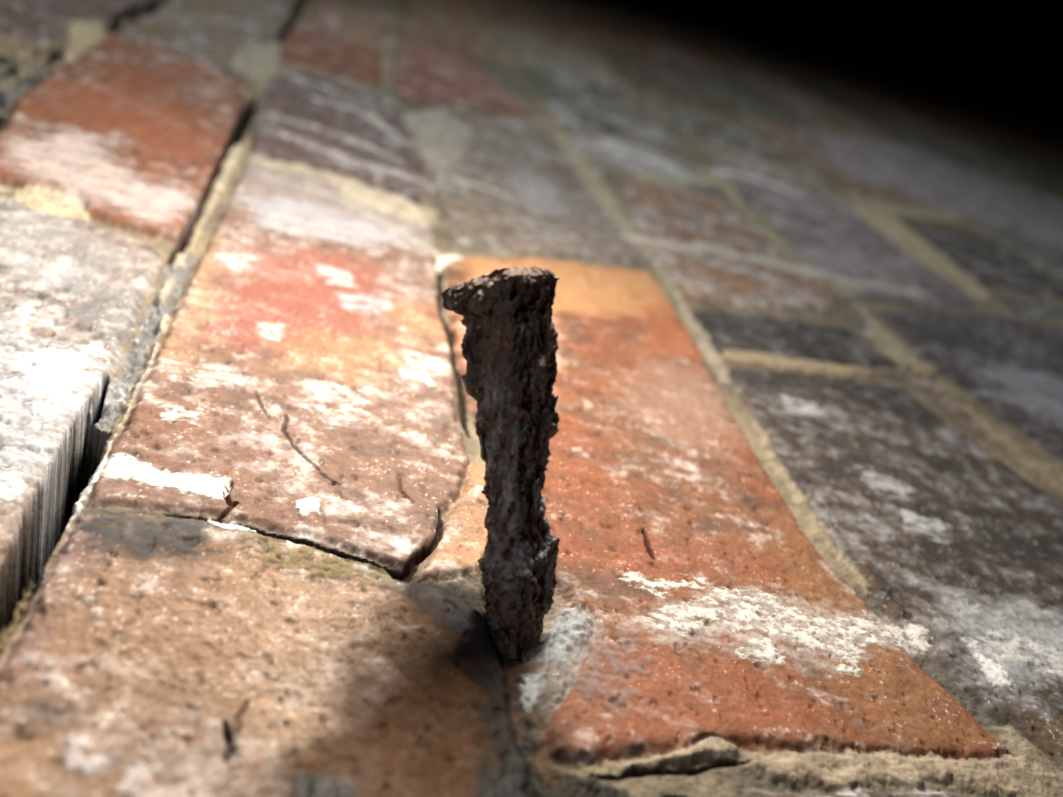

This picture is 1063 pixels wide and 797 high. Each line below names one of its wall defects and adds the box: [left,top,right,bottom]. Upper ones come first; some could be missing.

water stain [0,320,231,530]
crack [254,391,341,486]
rust [475,421,486,461]
rust [547,393,558,412]
crack [162,476,445,583]
rust [543,537,561,572]
water stain [283,577,619,797]
water stain [618,572,933,677]
water stain [955,601,1063,690]
water stain [67,738,108,771]
water stain [116,747,224,797]